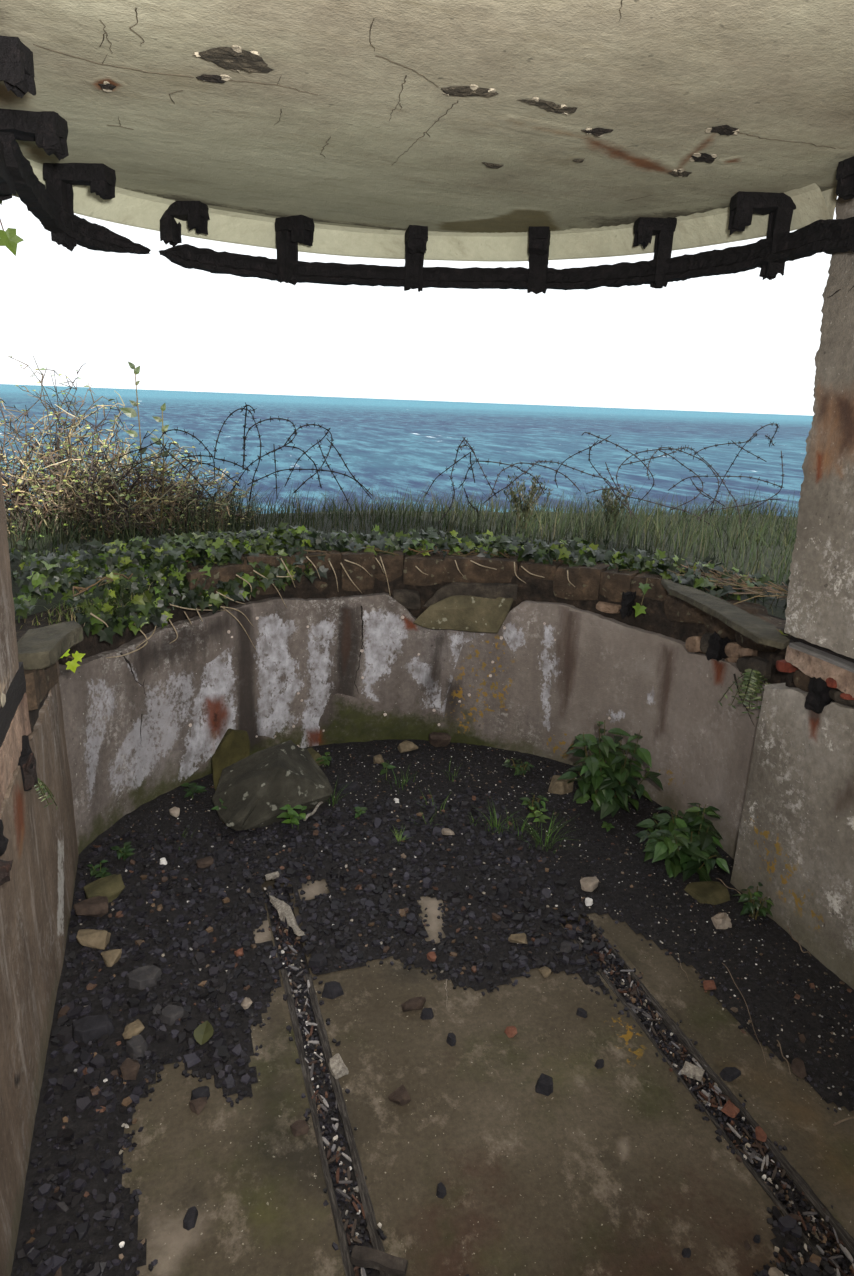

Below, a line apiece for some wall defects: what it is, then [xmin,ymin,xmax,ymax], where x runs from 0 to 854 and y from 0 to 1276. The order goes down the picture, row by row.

spalling [193,45,273,84]
spalling [441,84,498,97]
spalling [519,97,578,115]
spalling [582,128,613,137]
corrosion [495,114,748,180]
corrosion [803,367,854,500]
corrosion [200,693,233,757]